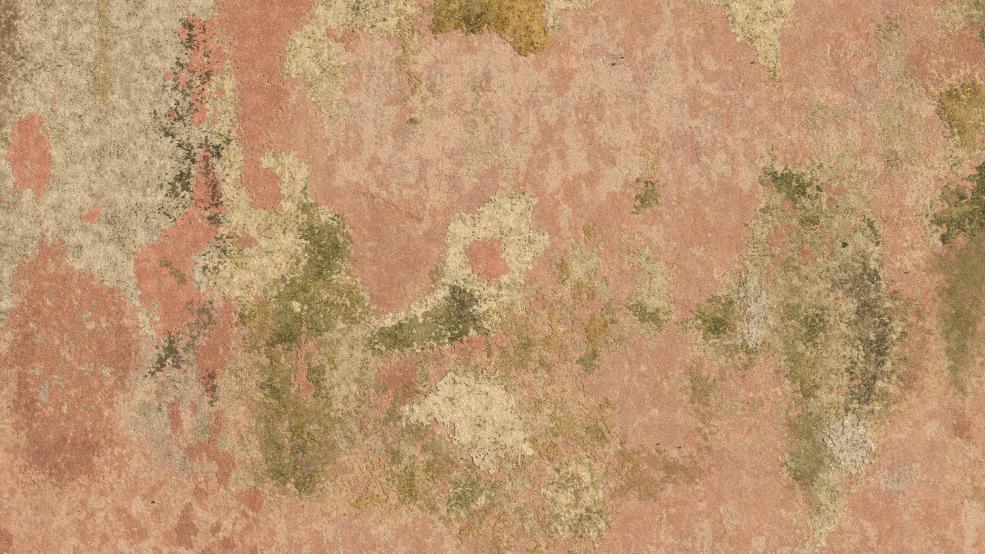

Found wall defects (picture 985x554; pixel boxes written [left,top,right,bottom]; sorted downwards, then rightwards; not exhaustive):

water stain [0,0,33,127]
peeling [374,58,523,176]
peeling [541,0,604,45]
peeling [686,0,799,103]
water stain [737,269,776,349]
water stain [819,218,933,507]